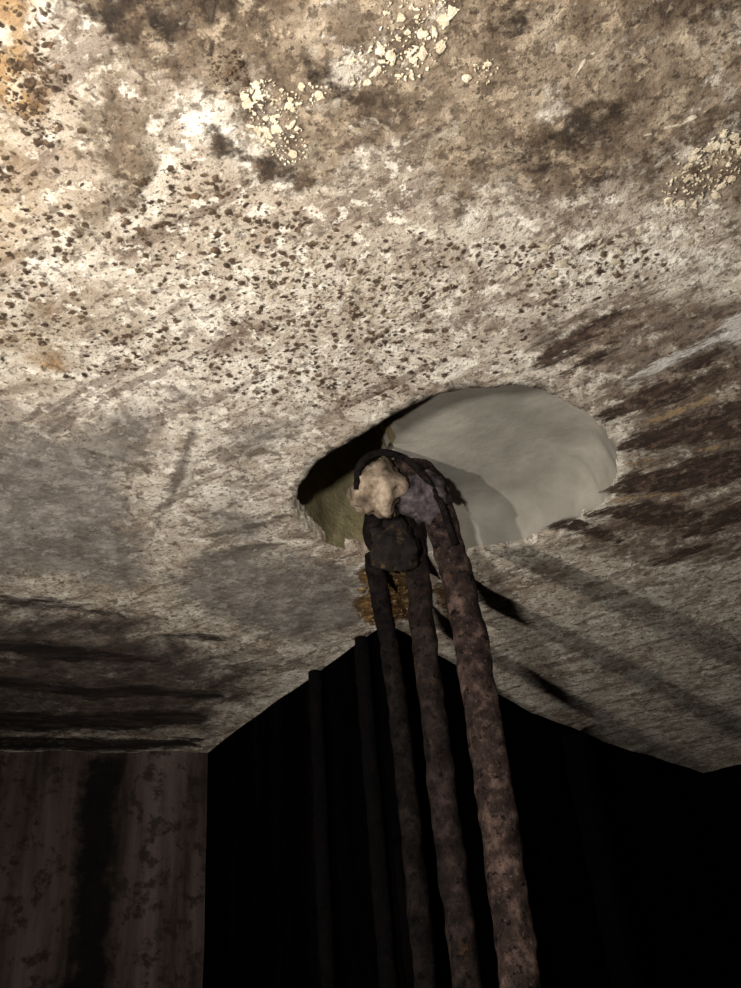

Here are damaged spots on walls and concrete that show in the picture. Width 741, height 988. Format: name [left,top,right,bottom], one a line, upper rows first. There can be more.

leakage [0,0,741,590]
peeling [528,310,622,377]
spalling [296,347,741,566]
leakage [0,595,123,616]
leakage [0,640,171,665]
leakage [164,633,223,641]
leakage [171,512,365,640]
rust [353,567,375,625]